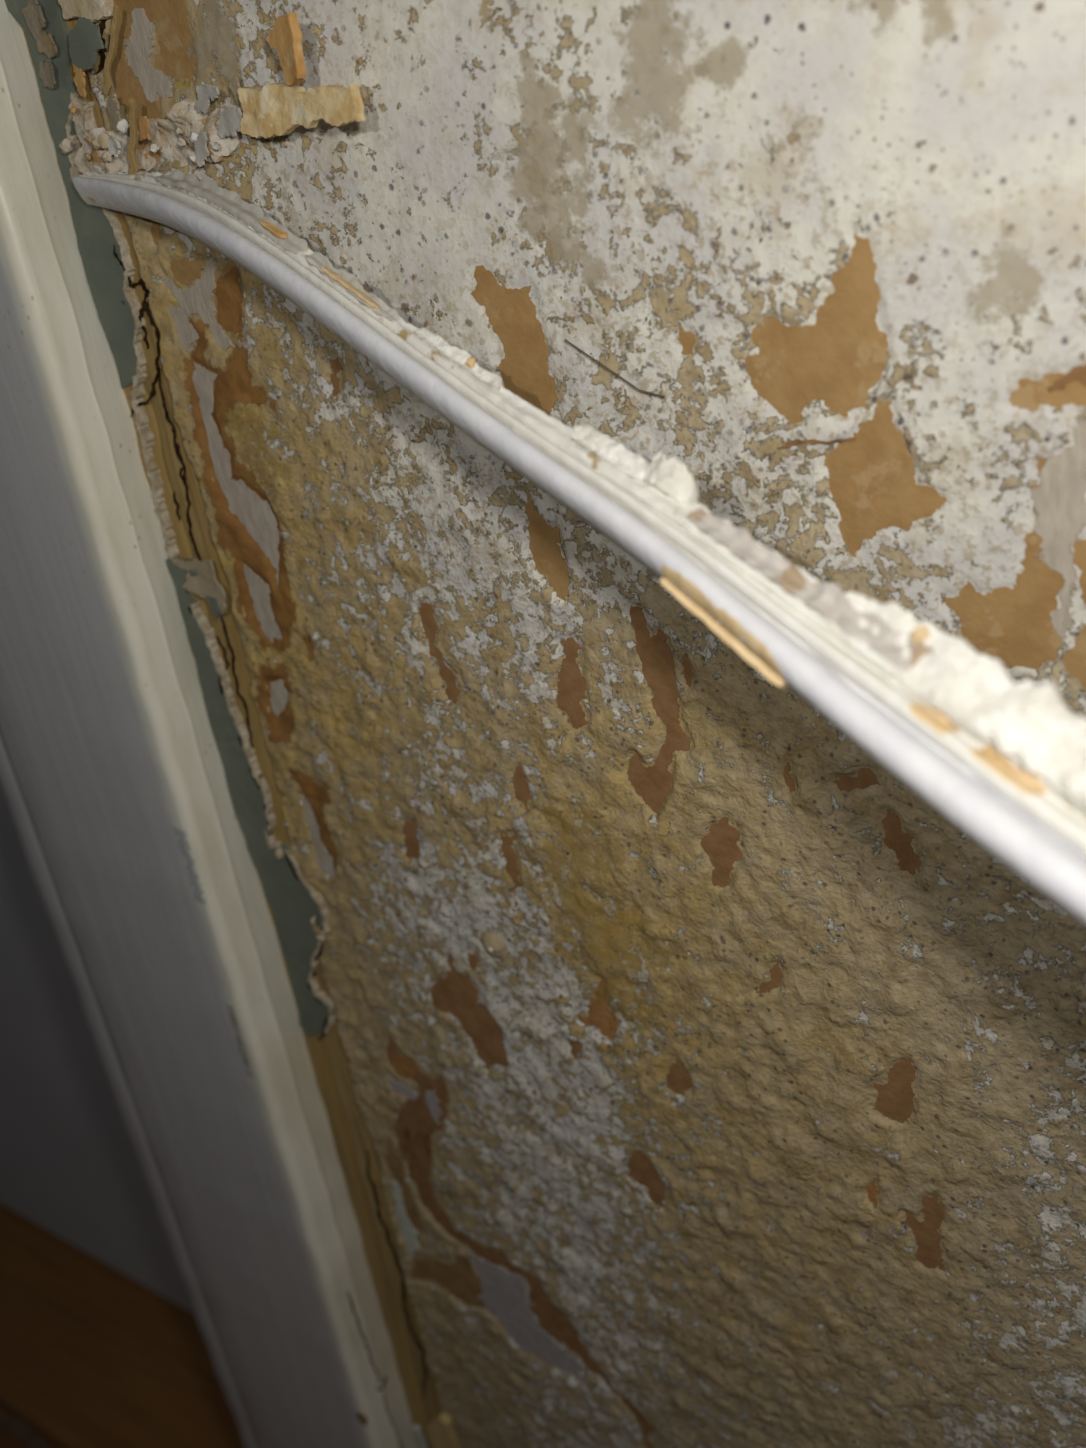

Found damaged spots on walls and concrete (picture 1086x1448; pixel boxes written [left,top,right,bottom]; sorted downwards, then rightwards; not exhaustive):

peeling [5,0,400,388]
crack [113,245,201,561]
peeling [471,265,558,416]
crack [777,437,856,449]
peeling [745,232,948,558]
peeling [1009,365,1086,412]
peeling [627,606,693,819]
peeling [660,565,786,689]
peeling [687,508,934,674]
peeling [941,514,1086,690]
peeling [430,950,508,1071]
peeling [371,1039,657,1448]